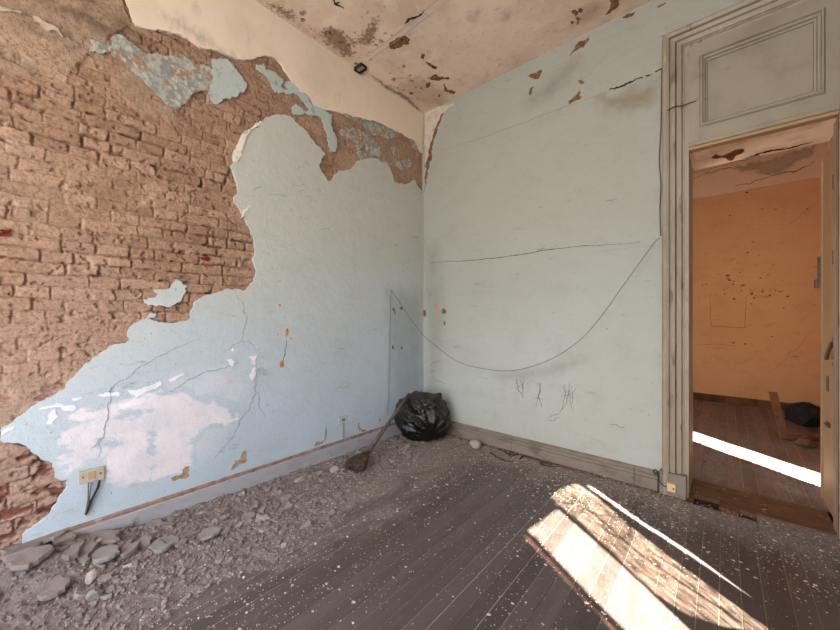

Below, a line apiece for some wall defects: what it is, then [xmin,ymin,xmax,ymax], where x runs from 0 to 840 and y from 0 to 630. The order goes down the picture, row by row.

water stain [323,15,380,57]
peeling [389,54,455,99]
crack [441,69,661,151]
peeling [712,149,744,161]
crack [694,142,815,187]
water stain [737,149,813,172]
crack [433,242,638,263]
flaking render [0,0,444,554]
crack [90,338,200,454]
crack [166,290,265,458]